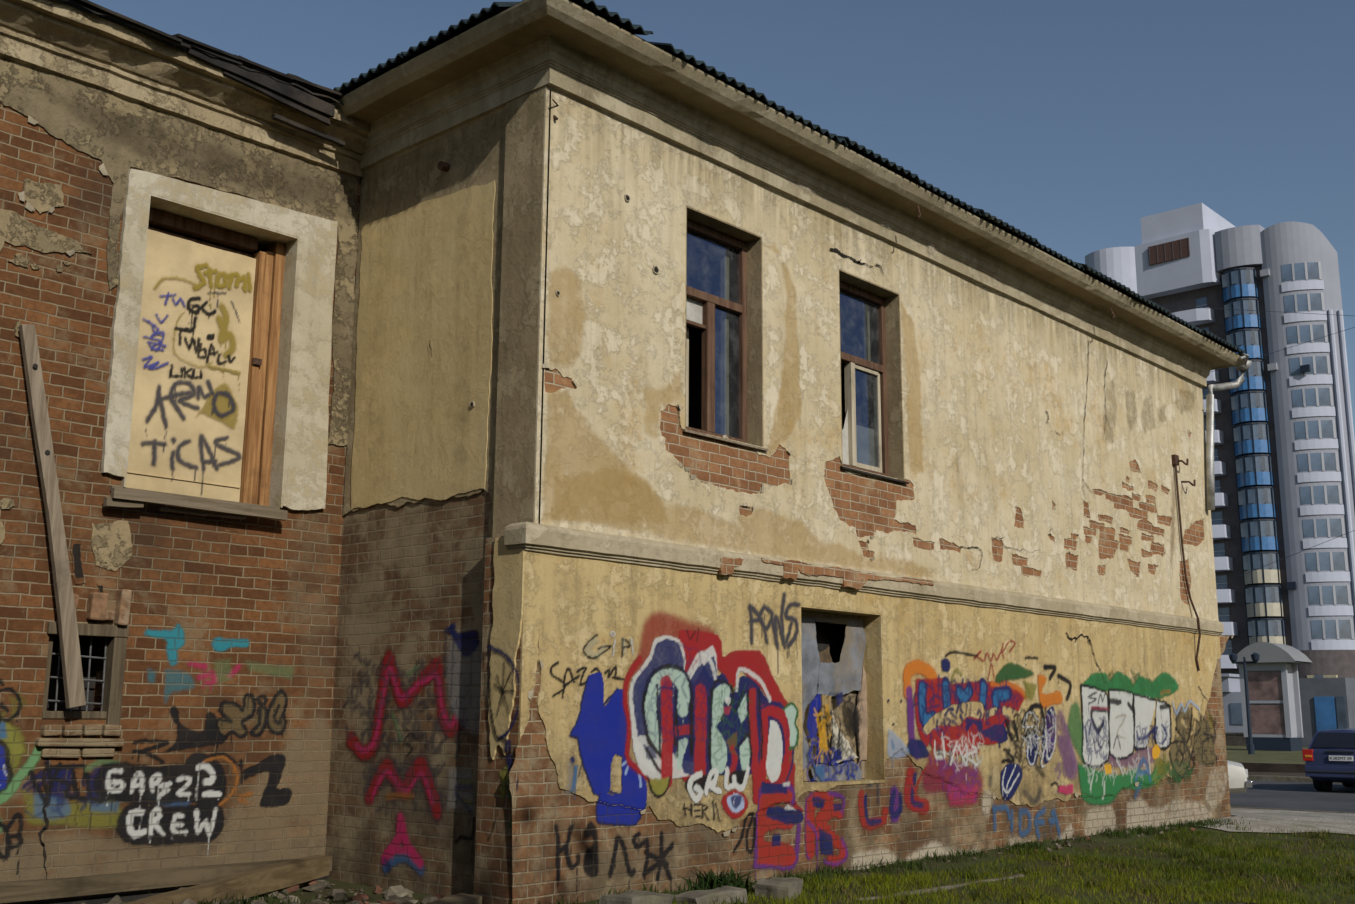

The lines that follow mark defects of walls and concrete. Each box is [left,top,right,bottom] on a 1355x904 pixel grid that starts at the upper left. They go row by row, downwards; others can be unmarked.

crack [830,248,884,274]
spalling [542,363,577,393]
spalling [0,103,340,878]
spalling [660,404,793,517]
spalling [719,557,744,575]
spalling [761,457,961,590]
spalling [991,538,1041,578]
spalling [1014,505,1023,528]
spalling [1048,459,1172,577]
spalling [1179,519,1204,605]
spalling [509,635,1234,904]